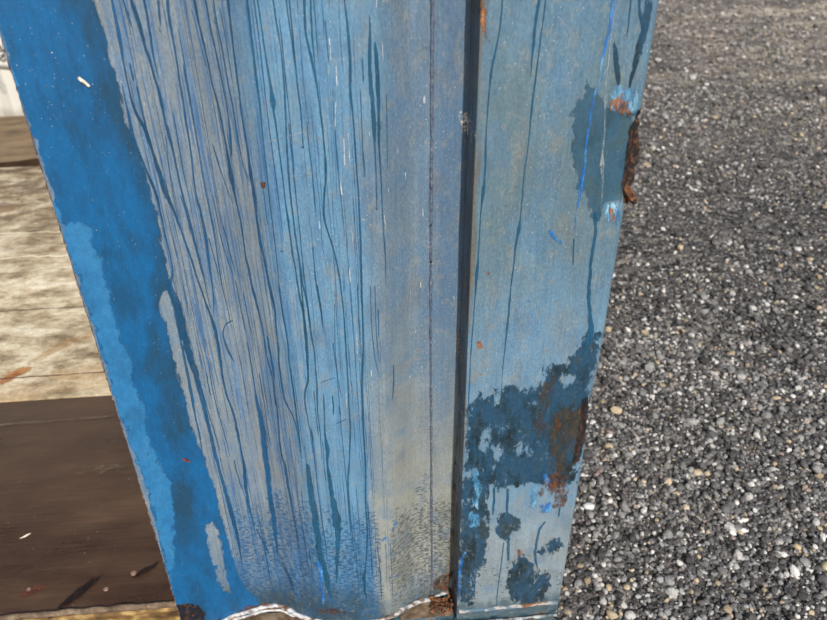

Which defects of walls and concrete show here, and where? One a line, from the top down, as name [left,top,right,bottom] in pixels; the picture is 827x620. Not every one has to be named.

rust [622,120,637,205]
rust [533,374,589,508]
peeling [469,470,480,528]
rust [433,531,459,608]